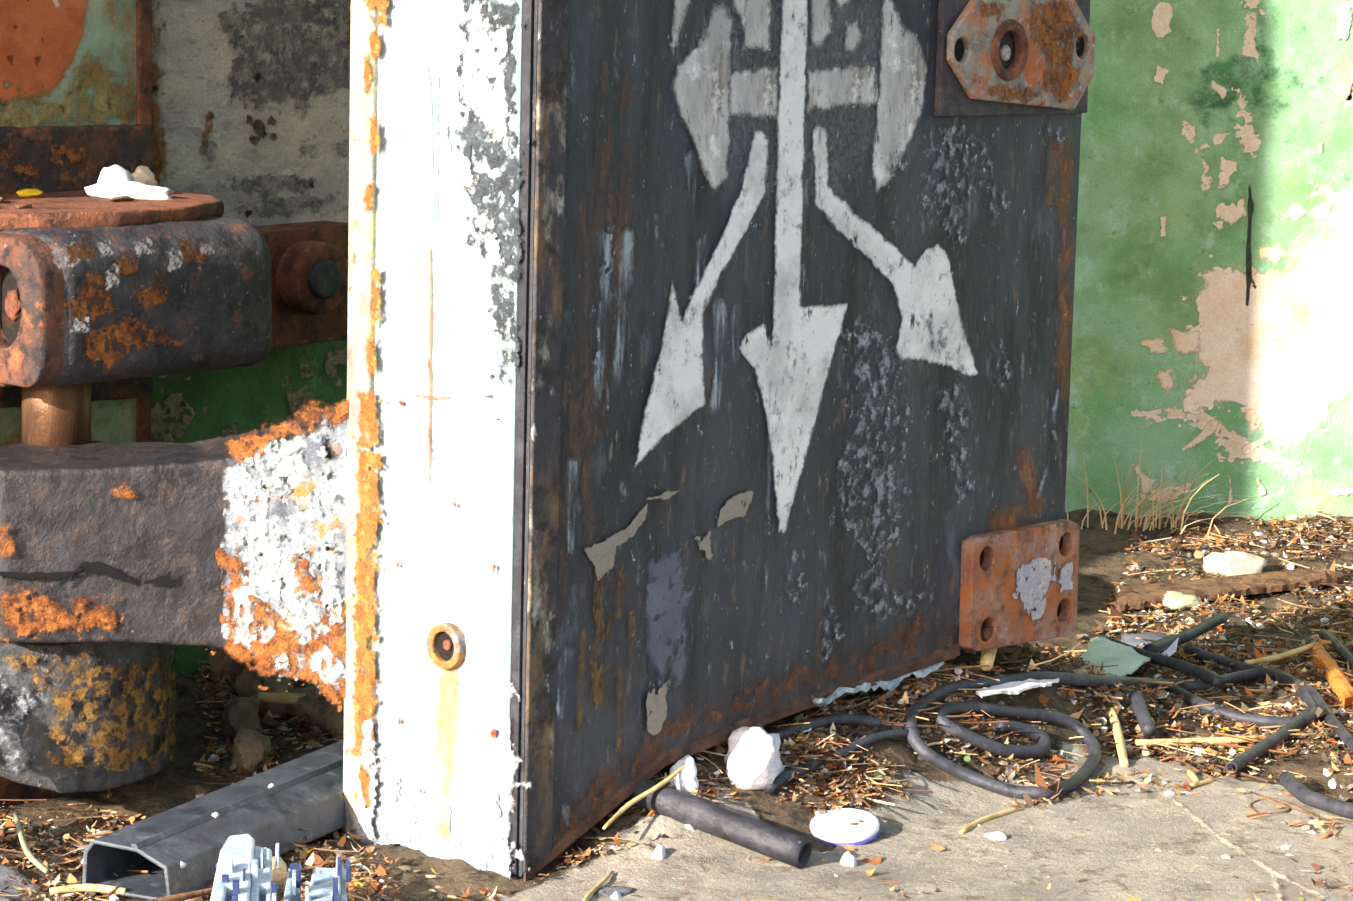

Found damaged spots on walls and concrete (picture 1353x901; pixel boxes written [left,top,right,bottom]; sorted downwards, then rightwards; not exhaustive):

rust [362,0,389,93]
rust [989,0,1084,104]
peeling [1151,2,1173,38]
rust [368,115,380,155]
peeling [438,0,532,398]
peeling [1182,80,1261,231]
rust [61,236,182,369]
peeling [1141,180,1353,461]
rust [0,524,15,558]
peeling [584,490,680,581]
peeling [637,490,753,735]
rust [0,584,176,786]